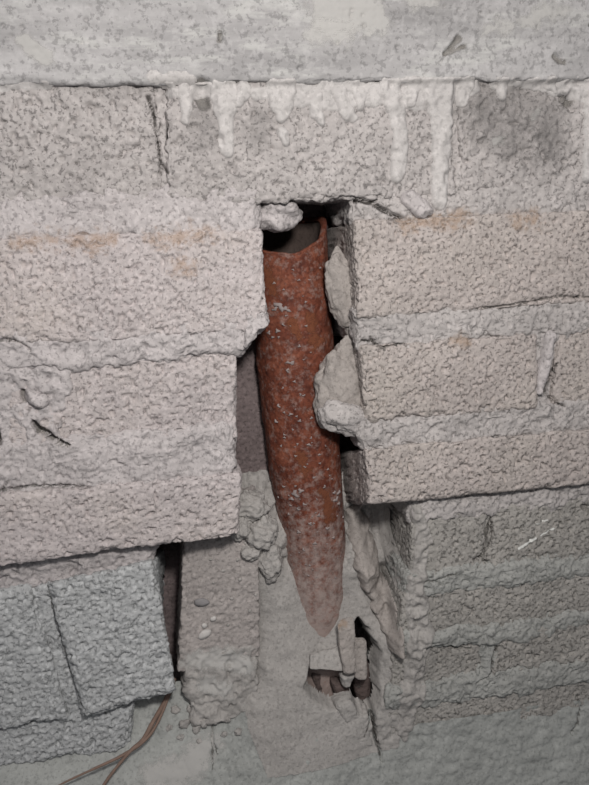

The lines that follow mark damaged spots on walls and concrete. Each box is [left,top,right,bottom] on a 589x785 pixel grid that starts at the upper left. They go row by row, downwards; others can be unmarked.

crack [147,97,169,174]
peeling [309,646,354,693]
crack [366,709,380,756]